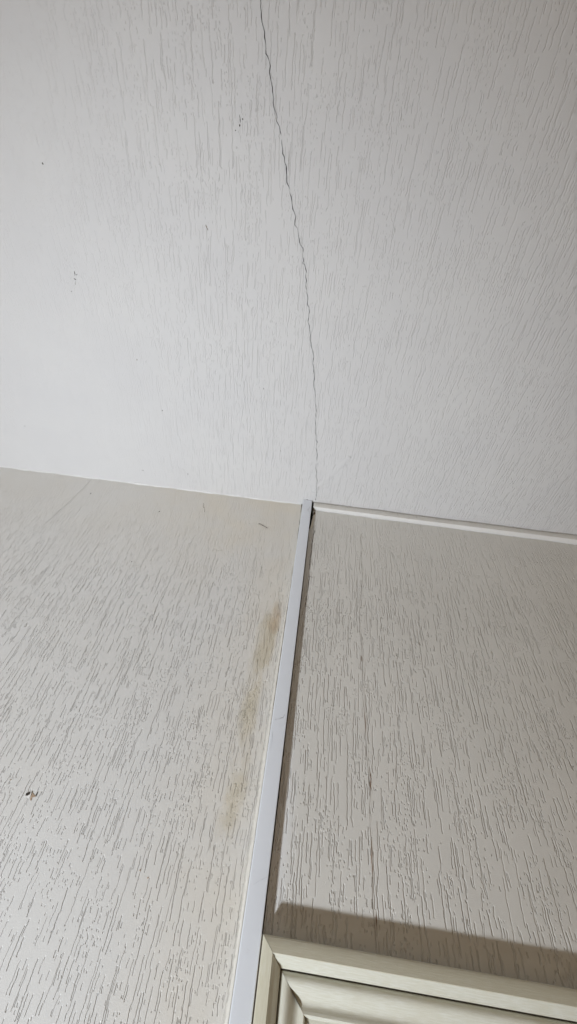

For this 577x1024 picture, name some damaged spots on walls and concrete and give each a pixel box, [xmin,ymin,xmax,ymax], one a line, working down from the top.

crack [259,0,318,719]